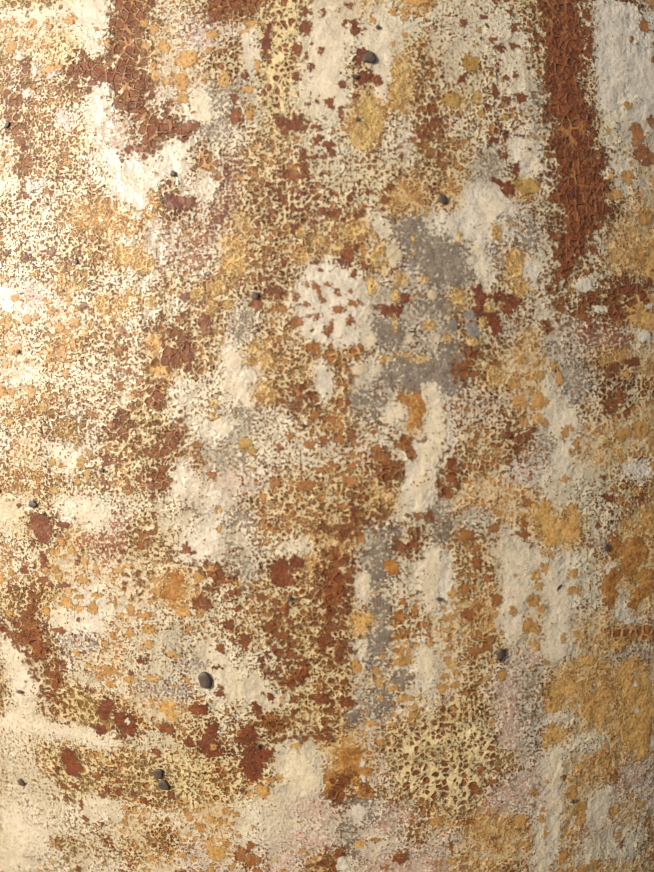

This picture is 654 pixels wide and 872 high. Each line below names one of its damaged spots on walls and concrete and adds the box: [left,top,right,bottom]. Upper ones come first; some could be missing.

peeling [78,0,108,47]
peeling [589,0,654,122]
peeling [85,73,113,132]
peeling [187,90,212,130]
peeling [575,277,593,293]
peeling [636,331,651,343]
peeling [0,634,200,809]